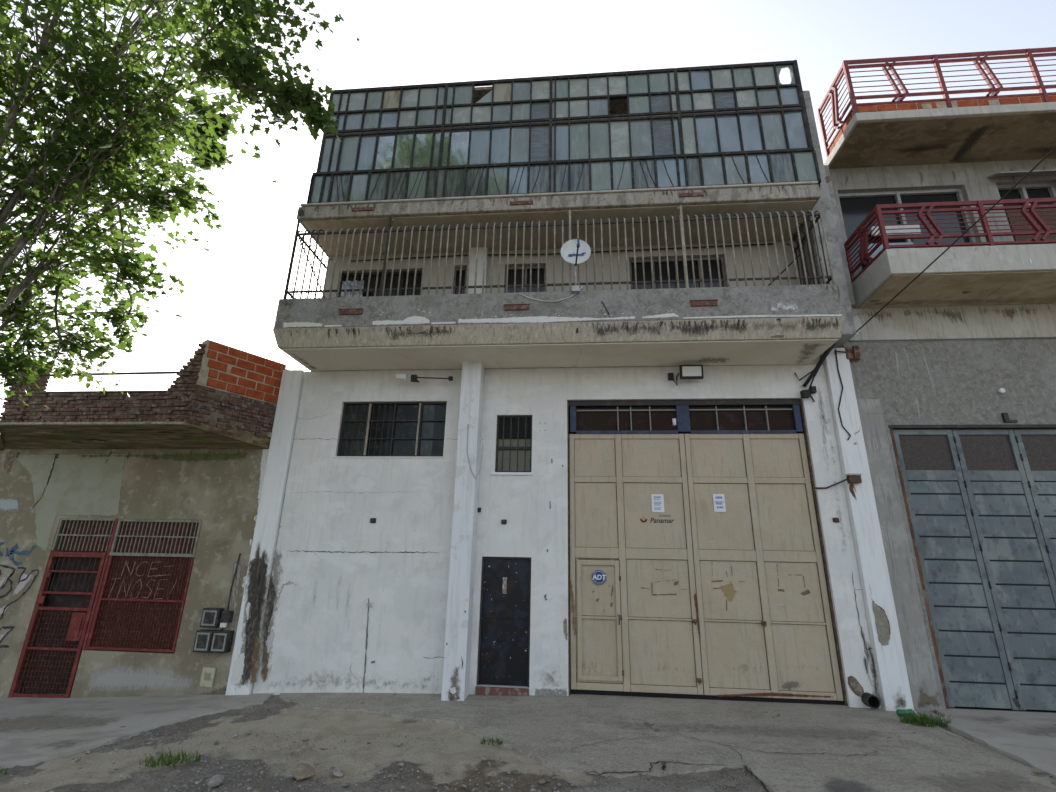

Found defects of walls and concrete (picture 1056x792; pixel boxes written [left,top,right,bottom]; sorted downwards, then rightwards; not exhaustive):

leakage [386,326,455,339]
leakage [593,318,838,336]
peeling [0,498,18,511]
crack [1,453,59,514]
peeling [712,566,744,611]
leakage [204,545,282,695]
spalling [870,589,890,647]